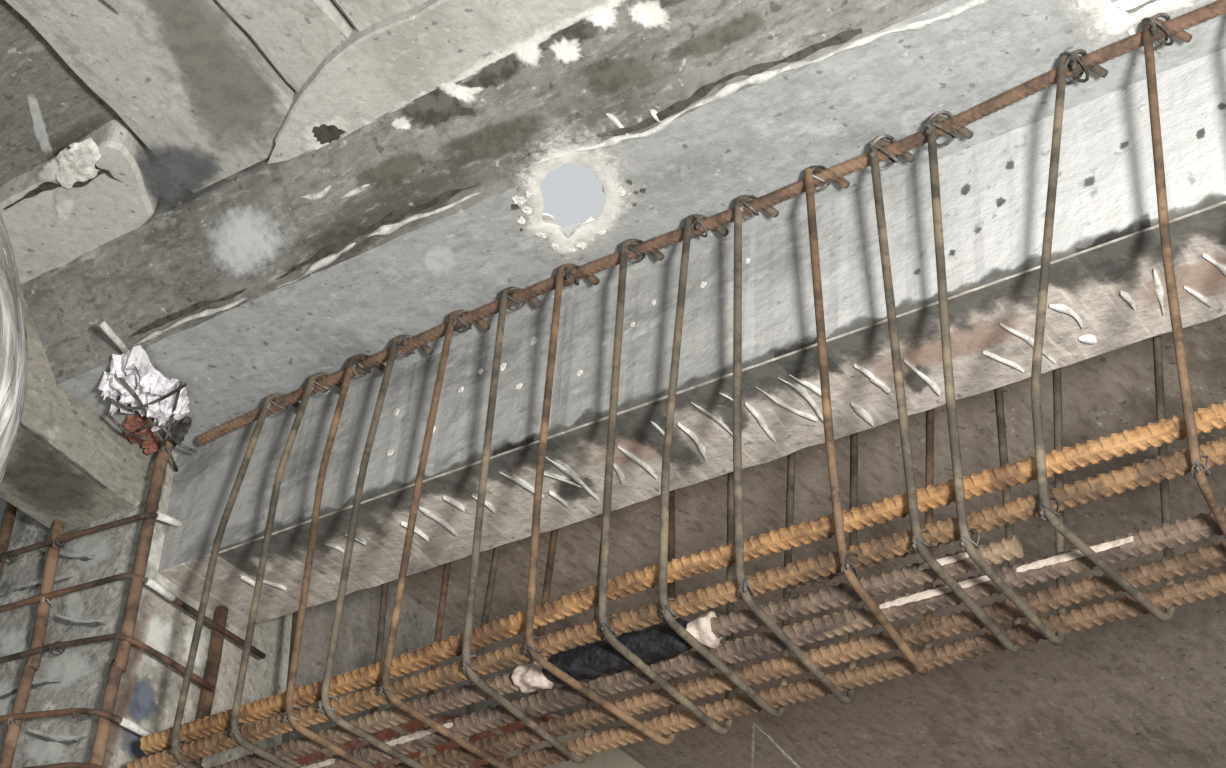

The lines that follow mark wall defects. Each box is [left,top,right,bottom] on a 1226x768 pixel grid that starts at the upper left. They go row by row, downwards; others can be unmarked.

spalling [1069,0,1205,44]
spalling [392,0,683,130]
spalling [511,132,646,259]
spalling [98,320,197,472]
leakage [218,195,1226,576]
spalling [756,375,823,422]
spalling [904,358,941,396]
spalling [650,421,706,460]
spalling [499,456,599,507]
peeling [148,533,177,595]
peeling [136,607,212,670]
peeling [295,582,459,689]